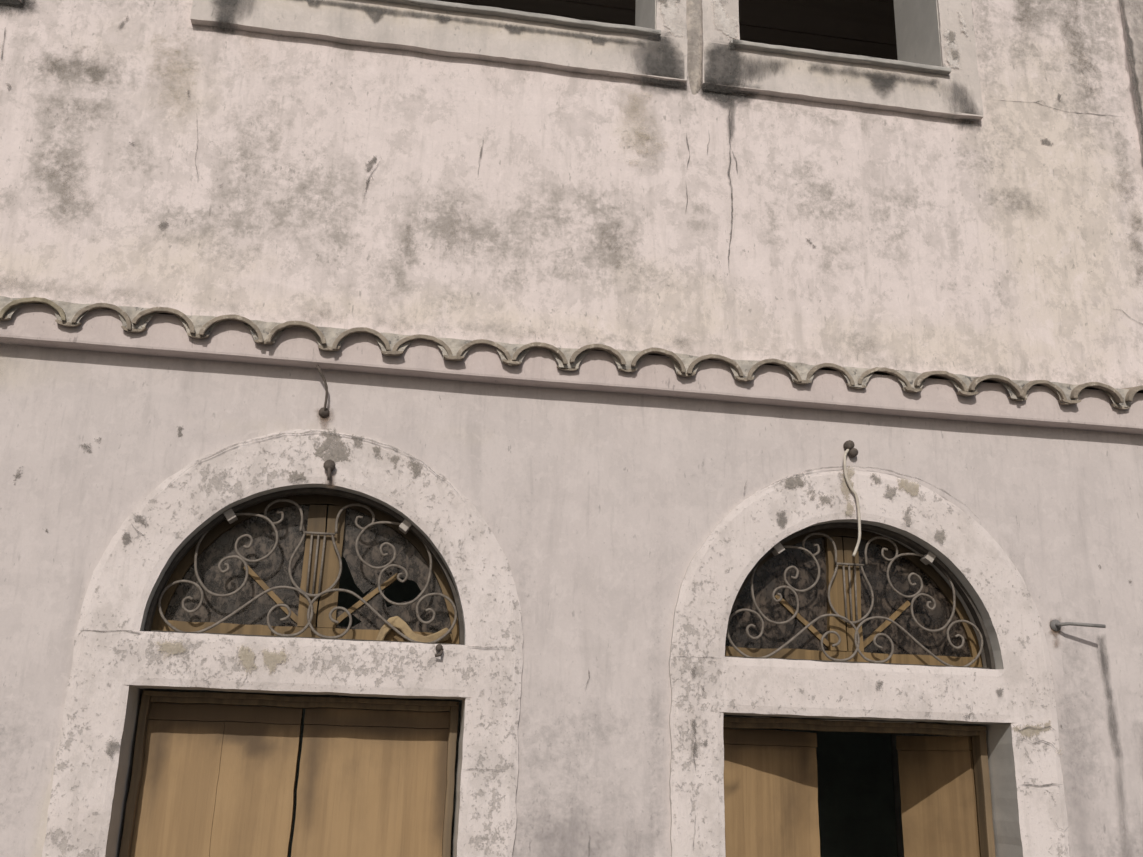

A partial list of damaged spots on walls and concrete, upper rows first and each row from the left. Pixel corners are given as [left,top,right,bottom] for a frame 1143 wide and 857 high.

water stain [0,0,34,12]
crack [1120,0,1143,135]
crack [686,112,738,260]